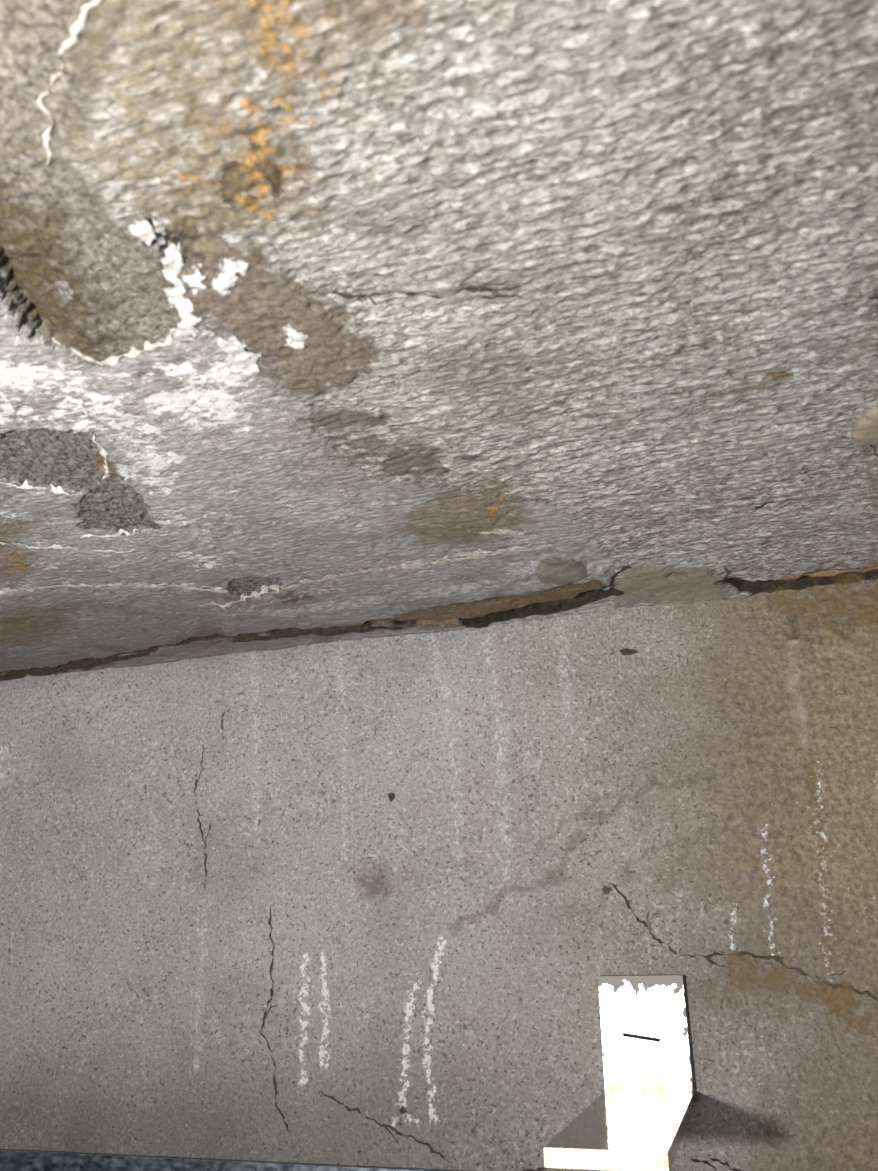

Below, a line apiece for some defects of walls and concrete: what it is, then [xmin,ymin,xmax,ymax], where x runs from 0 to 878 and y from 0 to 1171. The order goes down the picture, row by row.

rust [240,125,272,218]
spalling [0,0,554,609]
crack [0,566,632,681]
crack [719,567,878,595]
crack [194,711,225,888]
crack [608,878,878,1001]
crack [260,910,289,1132]
crack [318,1091,449,1162]
crack [523,1163,551,1171]
crack [690,1157,741,1171]